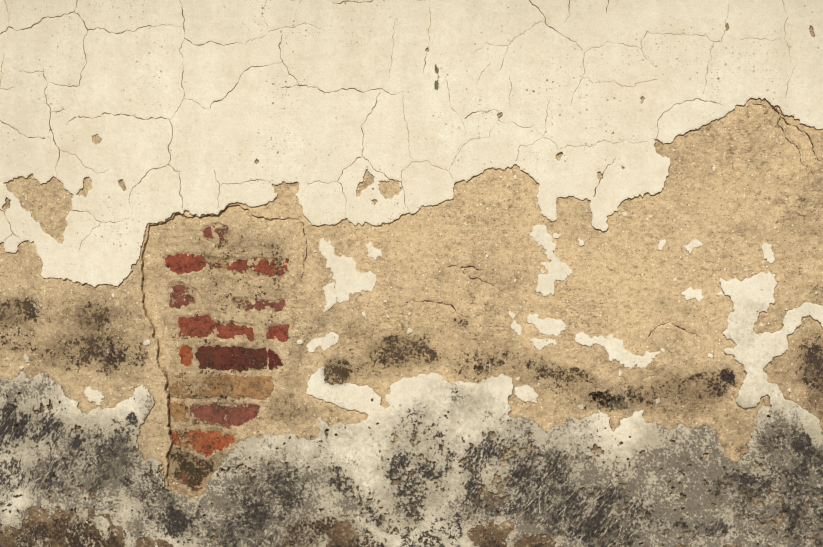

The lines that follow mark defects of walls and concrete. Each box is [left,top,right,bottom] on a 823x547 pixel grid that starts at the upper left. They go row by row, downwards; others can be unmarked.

crack [0,0,820,250]
damp [0,295,148,378]
damp [167,235,285,492]
flaking render [0,98,823,499]
damp [322,318,736,414]
damp [795,333,823,393]
damp [0,401,823,547]
flaking render [467,520,562,547]